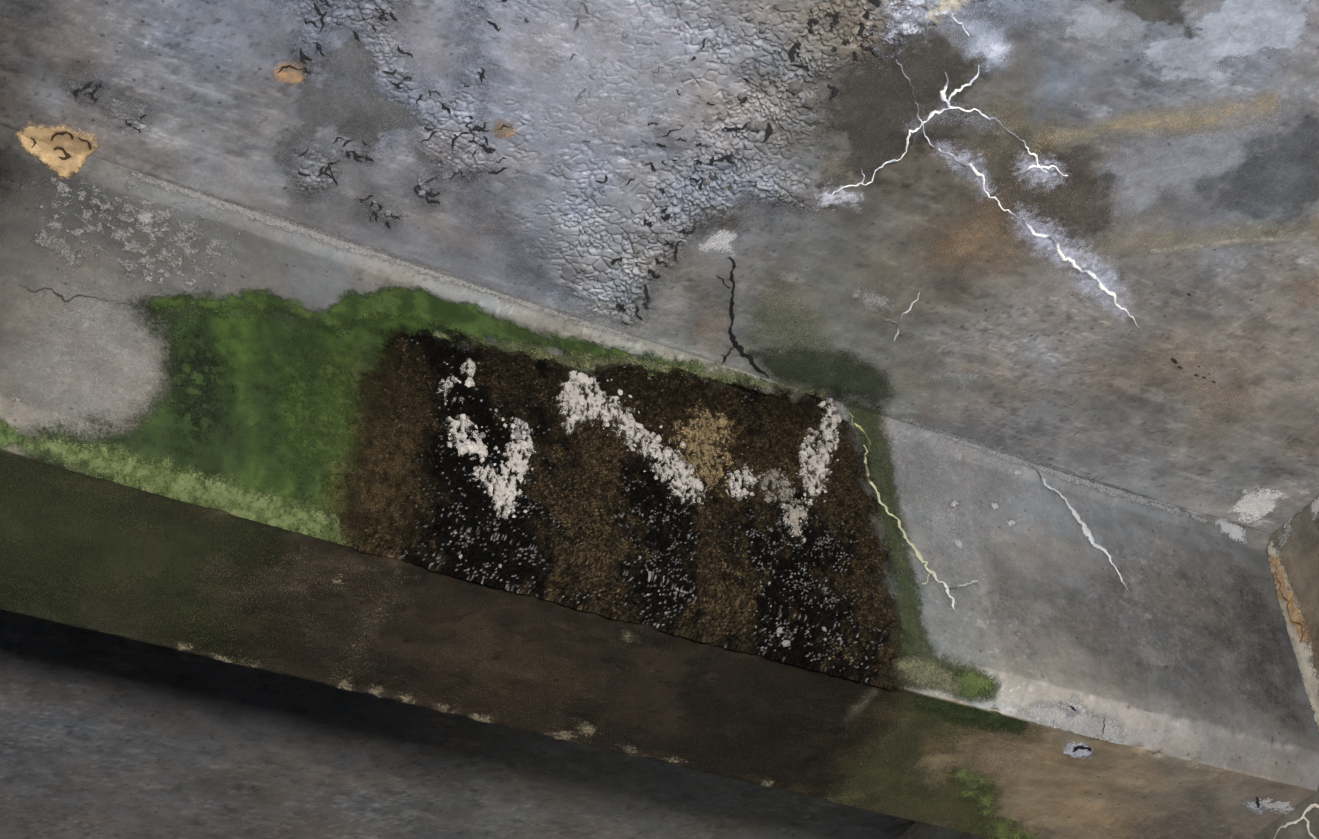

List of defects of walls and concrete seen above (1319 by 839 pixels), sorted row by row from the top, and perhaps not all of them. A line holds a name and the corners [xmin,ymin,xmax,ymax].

rust [275,64,304,83]
rust [16,125,98,177]
spalling [278,0,911,333]
crack [822,60,1142,332]
crack [716,257,769,379]
crack [882,292,920,342]
damp [162,329,916,801]
crack [844,410,978,609]
crack [1029,464,1127,589]
crack [1267,541,1319,734]
crack [1274,803,1319,839]